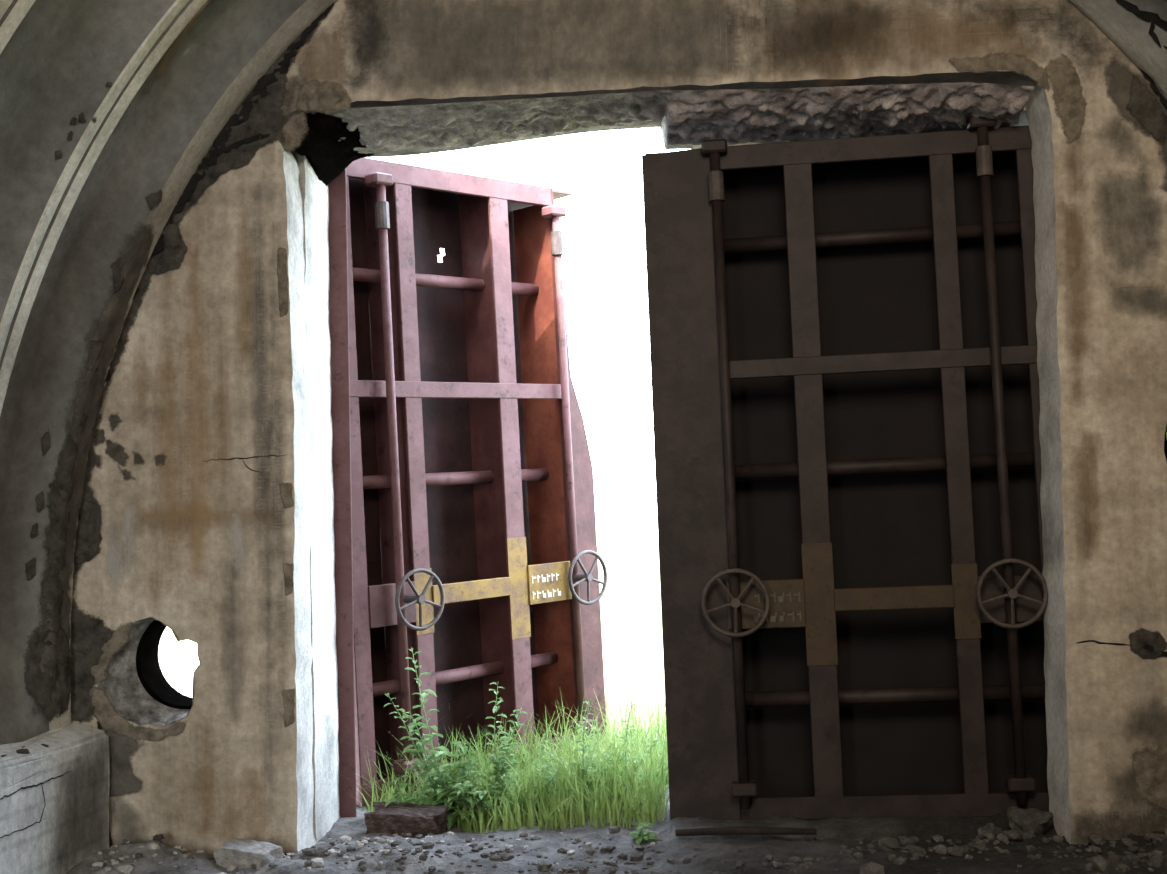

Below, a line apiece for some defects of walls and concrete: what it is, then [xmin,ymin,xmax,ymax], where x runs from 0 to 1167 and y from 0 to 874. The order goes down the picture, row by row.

crack [1116,0,1167,49]
crack [1139,68,1167,109]
leakage [1102,175,1159,264]
leakage [1117,287,1167,313]
spalling [24,13,1086,741]
crack [1077,640,1167,656]
leakage [1075,773,1167,844]